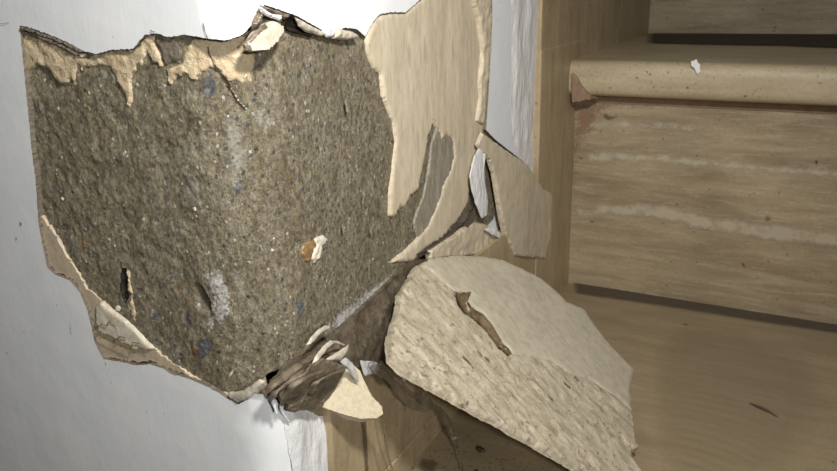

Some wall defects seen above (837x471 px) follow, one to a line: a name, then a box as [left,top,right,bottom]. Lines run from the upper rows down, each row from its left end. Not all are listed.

crack [203,24,247,110]
spalling [24,0,501,403]